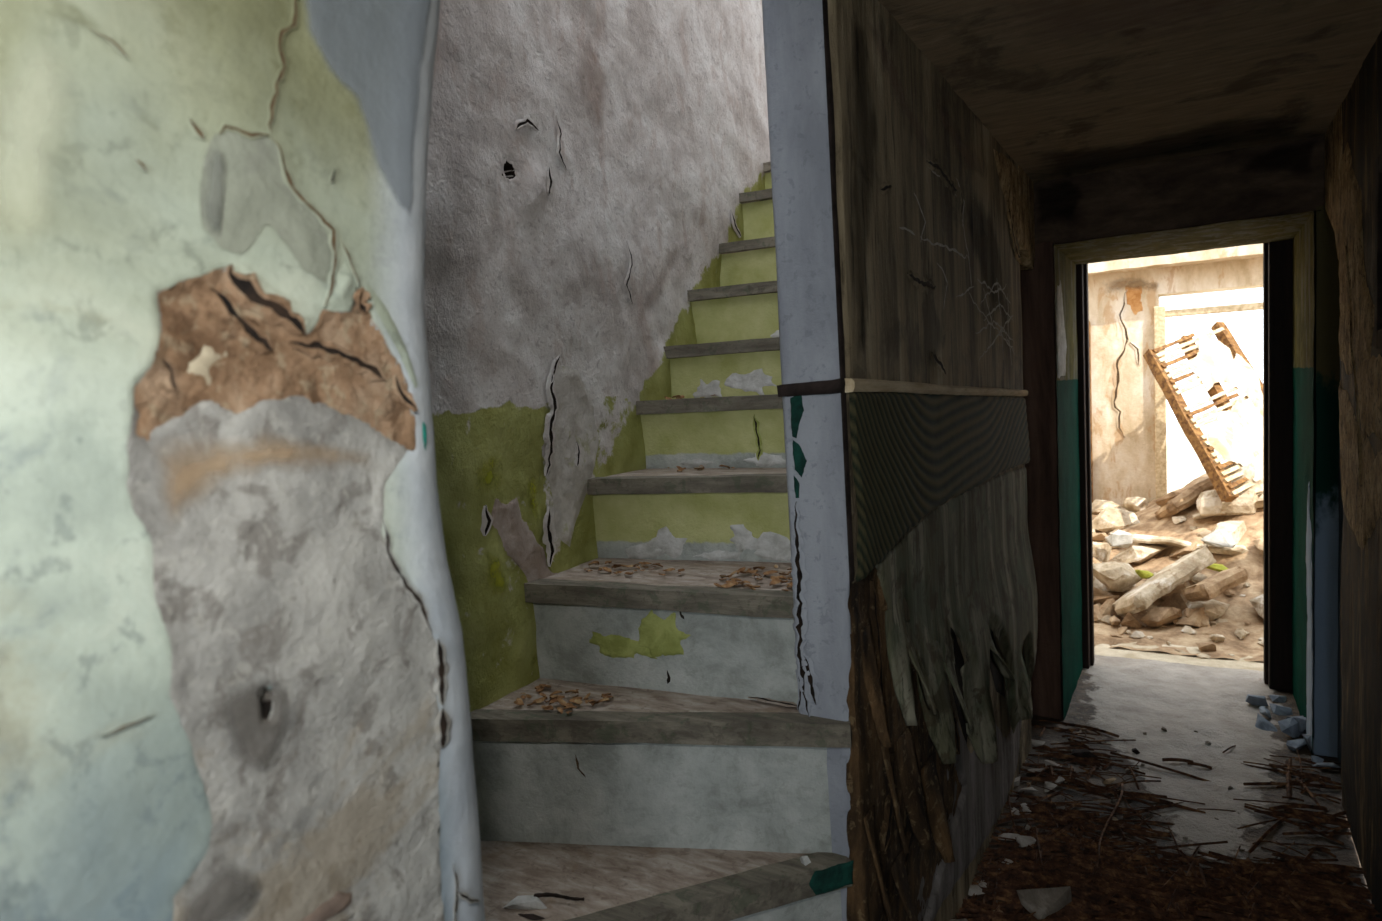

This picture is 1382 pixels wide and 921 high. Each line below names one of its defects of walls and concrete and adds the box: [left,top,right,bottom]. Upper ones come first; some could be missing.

crack [188,0,360,307]
spalling [501,156,517,183]
flaking render [126,130,444,921]
crack [542,355,581,567]
peeling [548,366,599,547]
peeling [624,524,791,562]
peeling [693,369,776,398]
peeling [743,396,807,498]
flaking render [1338,142,1382,551]
peeling [589,610,691,659]
peeling [800,392,1038,921]
flaking render [998,739,1067,864]